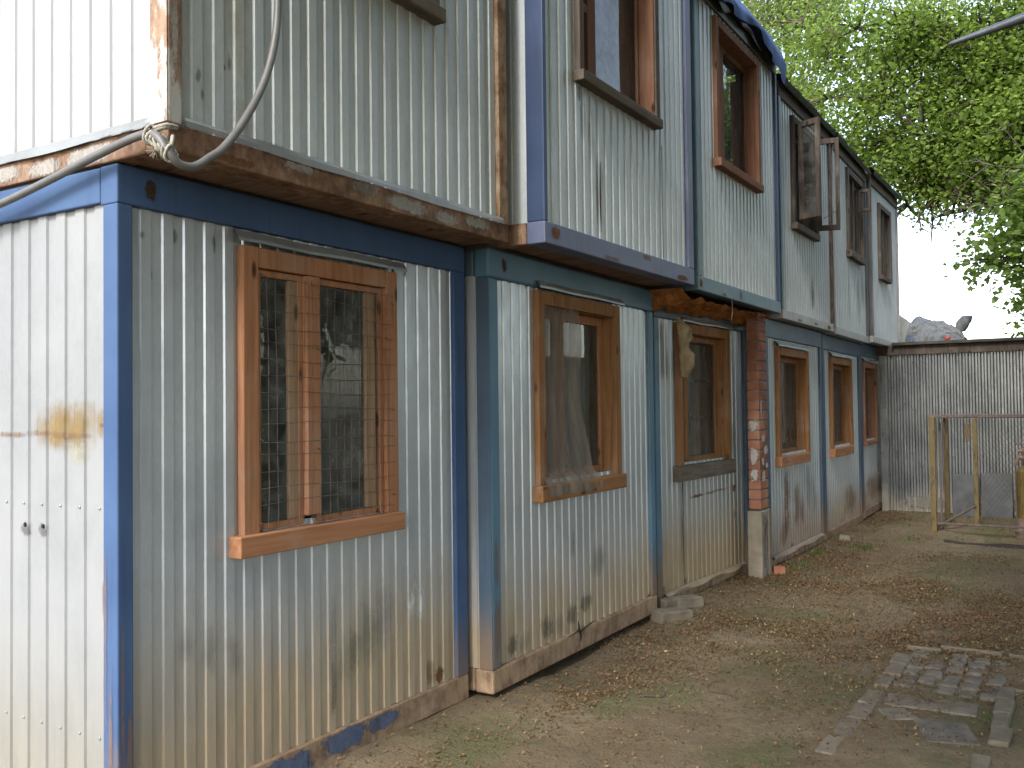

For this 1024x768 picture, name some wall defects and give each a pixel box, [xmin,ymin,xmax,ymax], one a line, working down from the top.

peeling [271,750,313,768]
peeling [321,710,399,759]